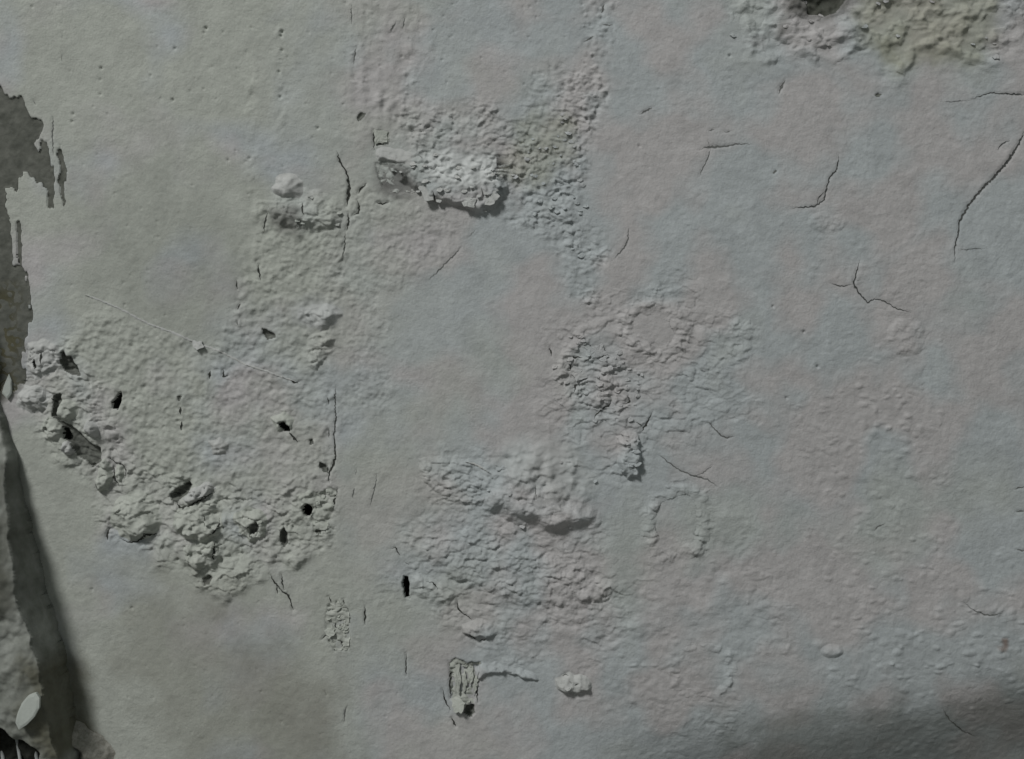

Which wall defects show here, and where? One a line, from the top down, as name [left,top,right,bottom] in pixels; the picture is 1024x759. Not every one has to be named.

peeling [729,0,1024,77]
crack [942,92,1022,102]
crack [699,129,751,173]
crack [798,157,839,208]
crack [954,135,1023,256]
spalling [0,86,67,399]
crack [835,263,906,311]
peeling [324,598,350,651]
spalling [16,692,41,729]
peeling [449,658,481,713]